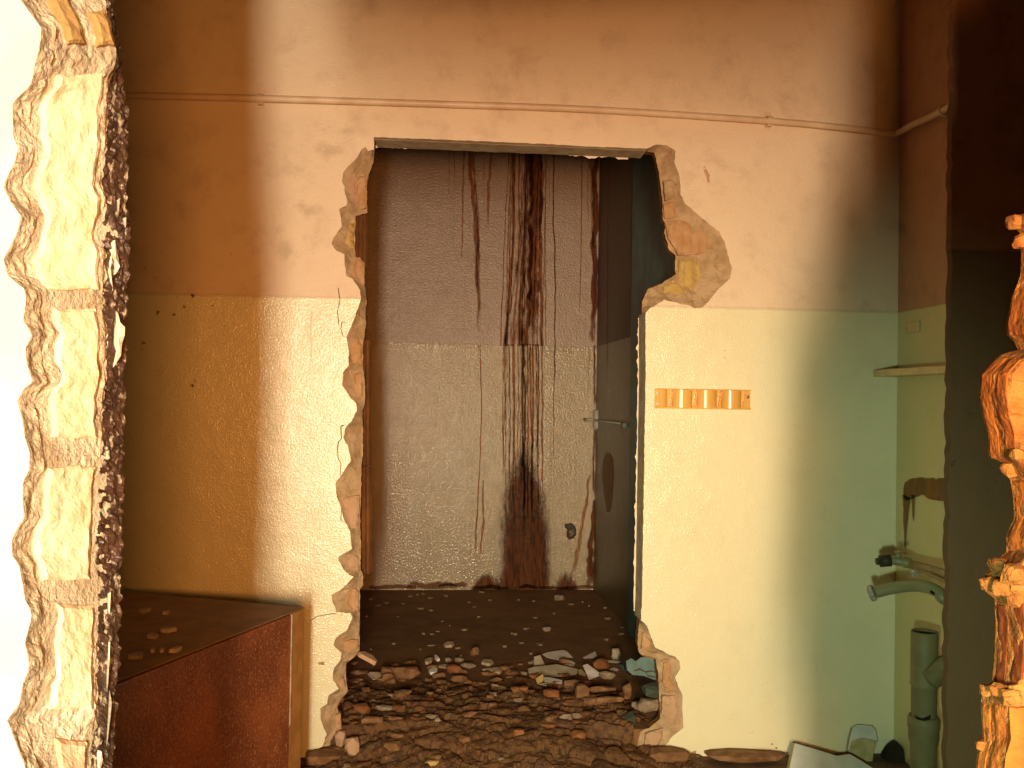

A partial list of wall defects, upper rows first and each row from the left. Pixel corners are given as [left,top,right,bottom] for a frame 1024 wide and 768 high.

spalling [4,0,182,768]
flaking render [318,143,378,747]
corrosion [449,151,492,319]
corrosion [473,153,599,590]
hole [565,523,576,540]
flaking render [633,145,731,748]
spalling [976,214,1024,768]